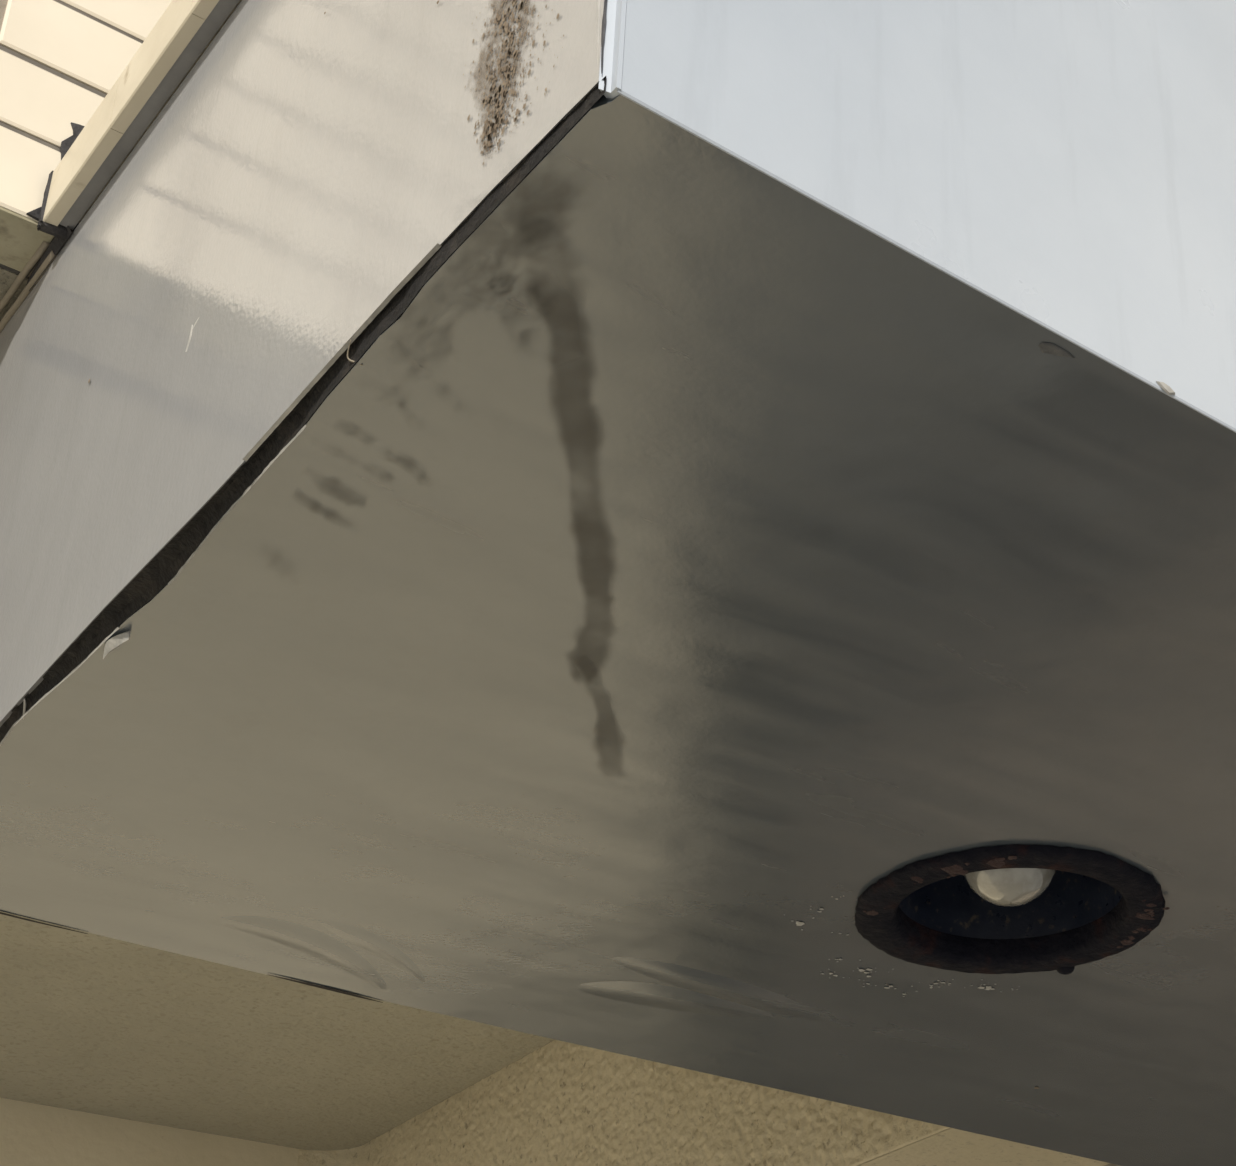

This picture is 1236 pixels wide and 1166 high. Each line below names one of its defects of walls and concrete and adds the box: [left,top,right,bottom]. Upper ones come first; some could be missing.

mould [463,0,564,164]